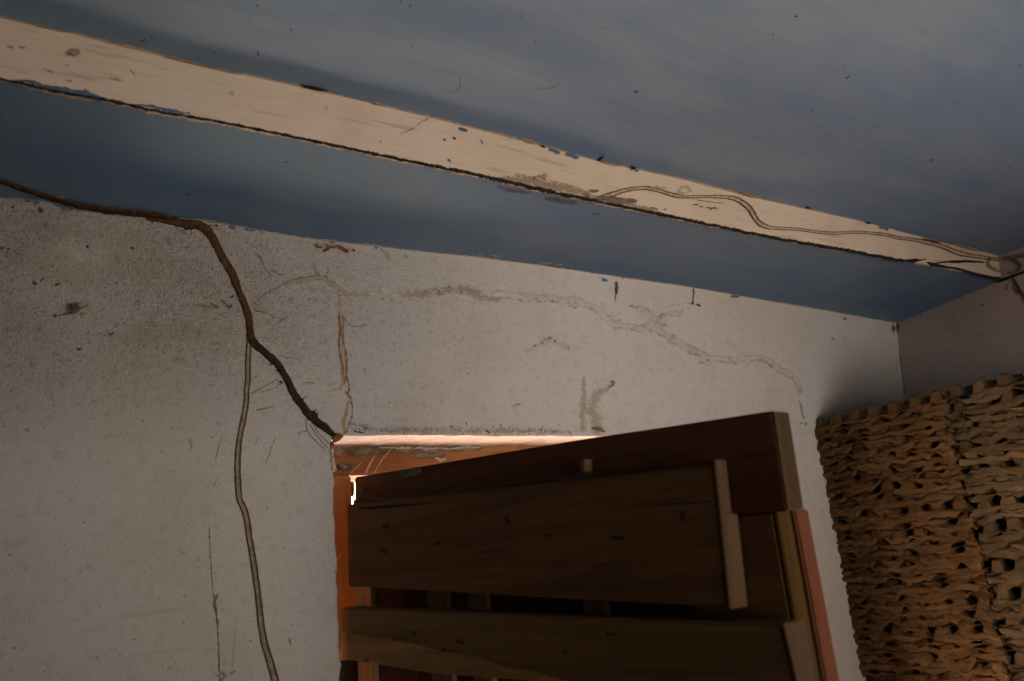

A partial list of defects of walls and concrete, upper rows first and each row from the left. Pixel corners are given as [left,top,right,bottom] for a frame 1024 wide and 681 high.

crack [0,178,336,681]
crack [0,77,1024,283]